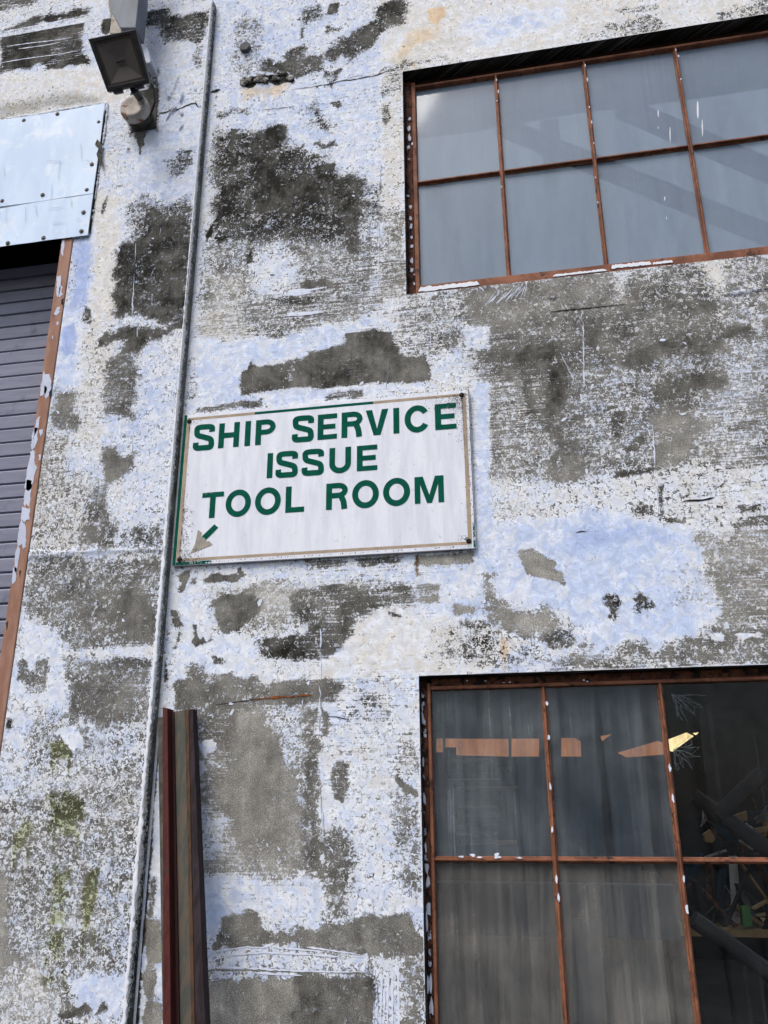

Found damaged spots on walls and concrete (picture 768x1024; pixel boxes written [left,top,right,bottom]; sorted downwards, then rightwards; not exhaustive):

peeling [0,0,111,76]
peeling [146,7,211,72]
peeling [567,3,674,43]
peeling [711,0,768,22]
peeling [204,0,412,259]
damp [488,283,527,304]
peeling [12,188,194,730]
peeling [163,315,768,1024]
damp [49,753,72,781]
damp [79,927,98,955]
damp [216,946,359,958]
damp [377,956,400,1024]